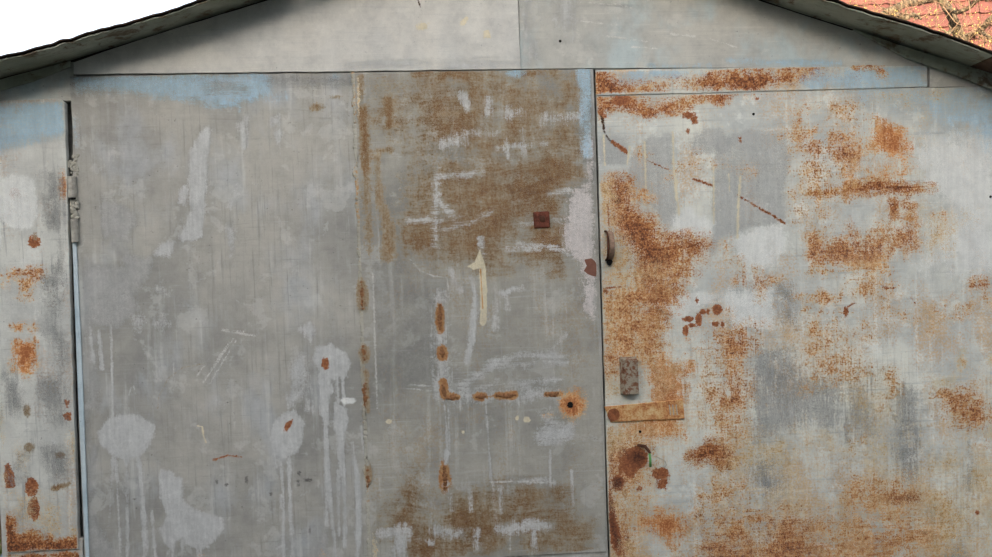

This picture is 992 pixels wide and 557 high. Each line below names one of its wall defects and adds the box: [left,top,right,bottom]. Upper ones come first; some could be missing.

corrosion [28,232,42,248]
corrosion [0,264,49,303]
corrosion [354,65,992,557]
corrosion [6,319,41,382]
corrosion [0,400,80,557]